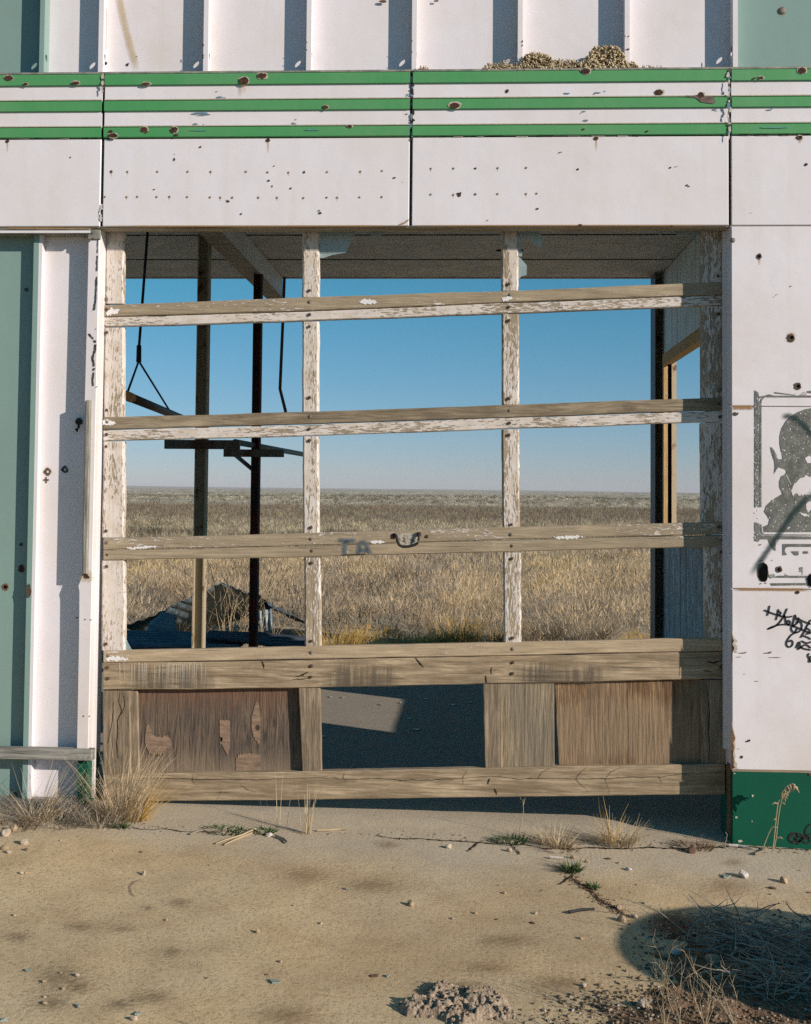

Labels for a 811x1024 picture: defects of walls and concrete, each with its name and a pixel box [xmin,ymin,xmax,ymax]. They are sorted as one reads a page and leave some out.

rust [238,72,268,85]
crack [377,835,811,915]